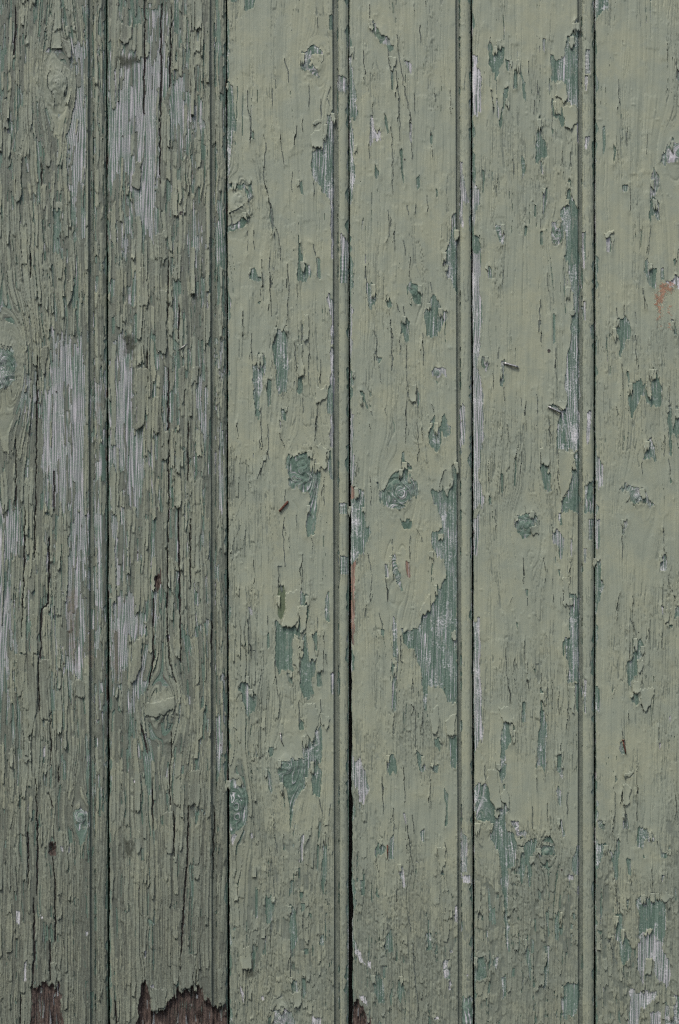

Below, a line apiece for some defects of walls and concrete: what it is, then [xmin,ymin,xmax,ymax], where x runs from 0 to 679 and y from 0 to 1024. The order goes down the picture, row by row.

crack [47,70,68,103]
peeling [521,19,590,178]
peeling [108,0,335,1024]
peeling [381,460,459,774]
peeling [540,179,604,714]
peeling [351,689,580,1024]
peeling [596,875,679,1024]